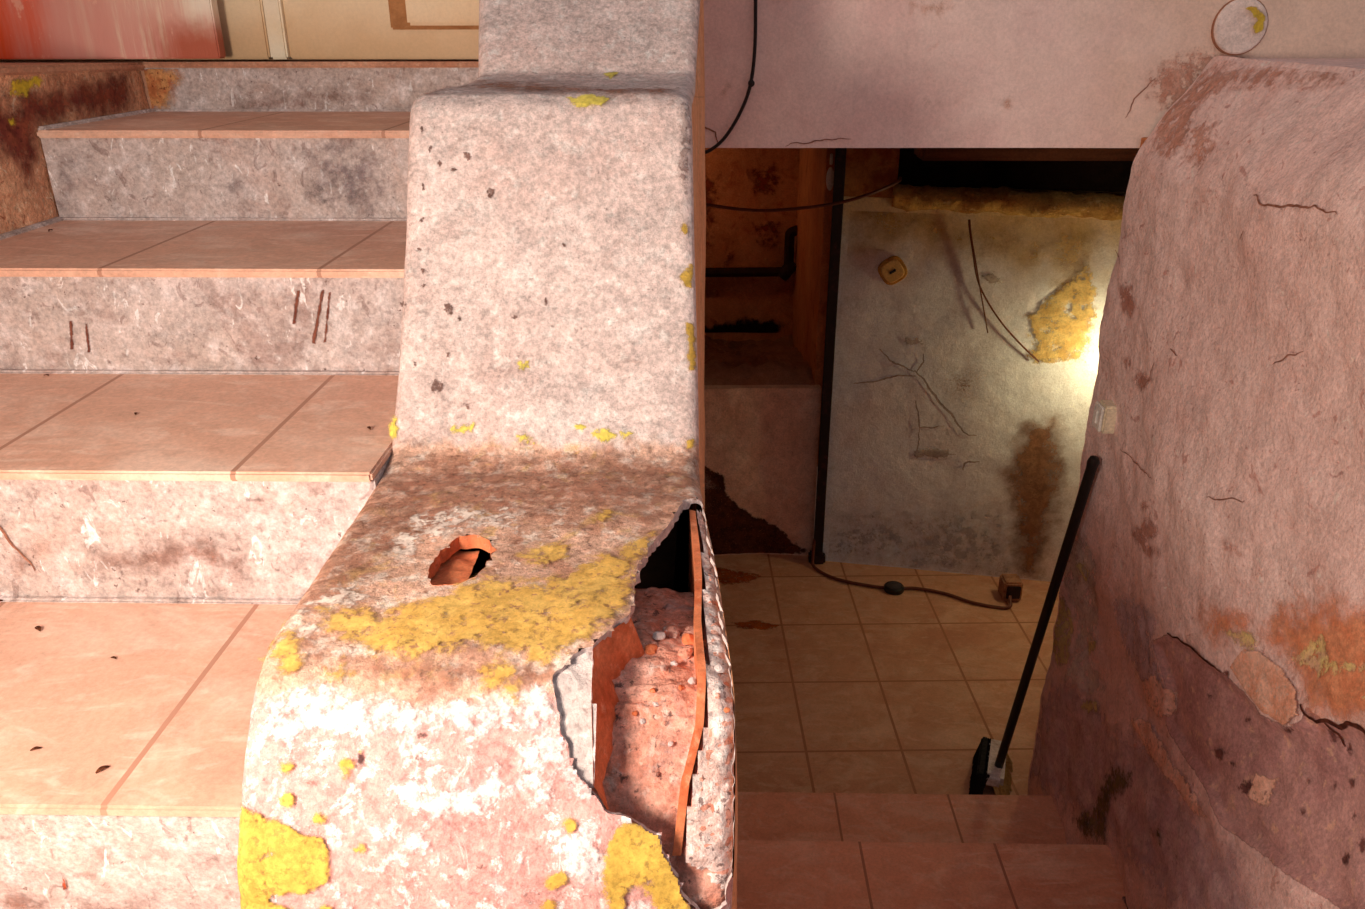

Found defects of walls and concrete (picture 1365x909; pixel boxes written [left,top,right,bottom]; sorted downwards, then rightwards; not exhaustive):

leakage [705,175,717,244]
crack [1253,194,1337,214]
peeling [1120,286,1134,317]
crack [854,349,979,470]
leakage [838,419,1065,576]
rust [716,567,760,585]
rust [735,620,779,630]
crack [1167,633,1221,673]
spalling [267,466,806,909]
crack [1299,703,1365,747]
spalling [1131,634,1365,909]